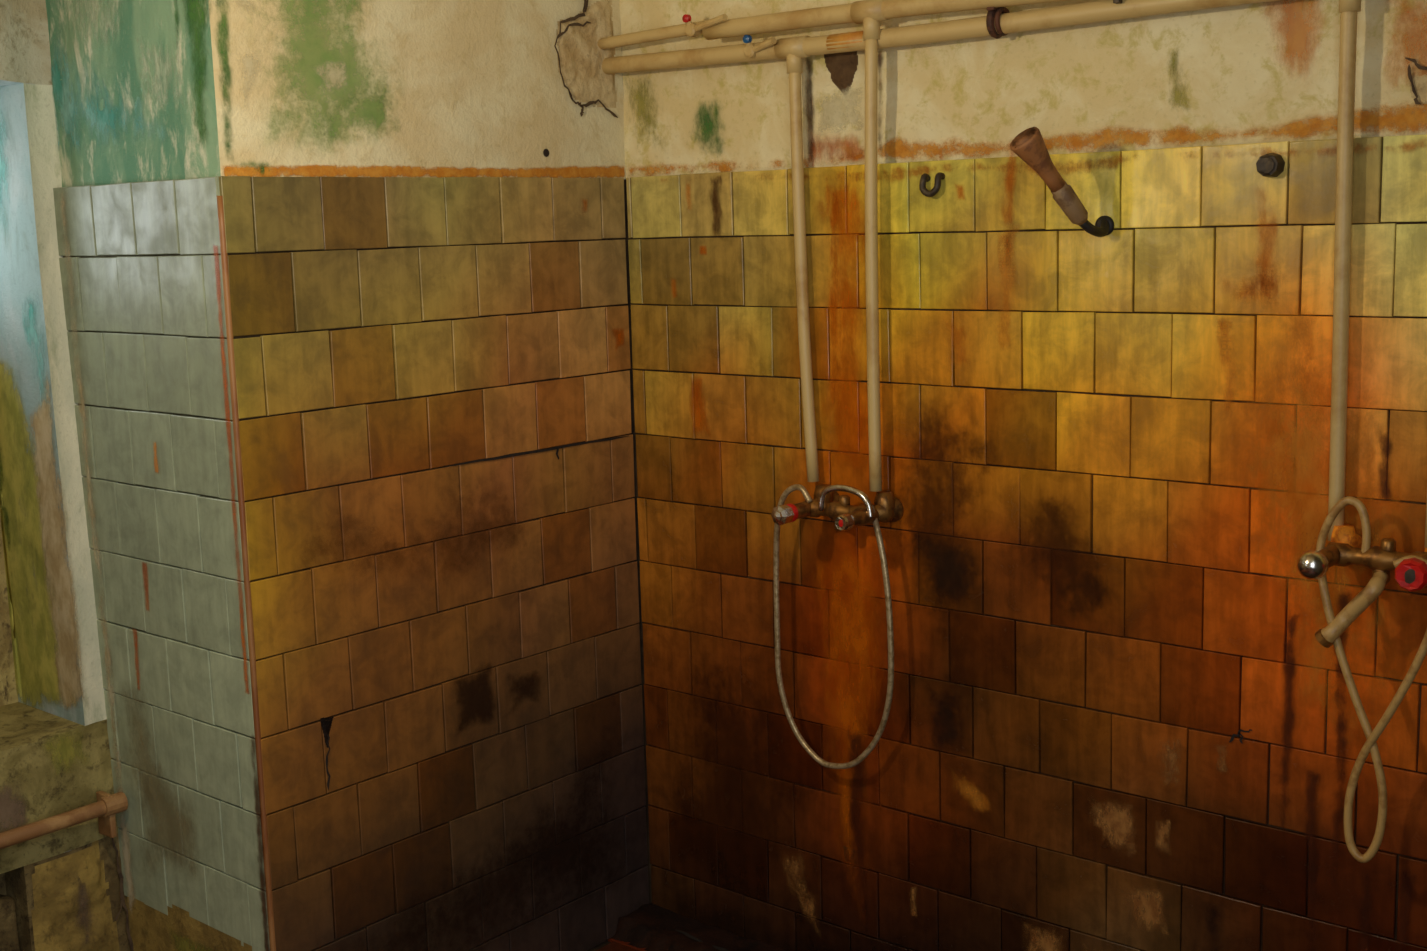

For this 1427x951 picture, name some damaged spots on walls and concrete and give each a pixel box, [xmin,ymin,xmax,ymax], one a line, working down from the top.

spalling [556,0,617,108]
water stain [1094,803,1134,848]
water stain [1127,890,1166,932]
water stain [1027,926,1060,951]